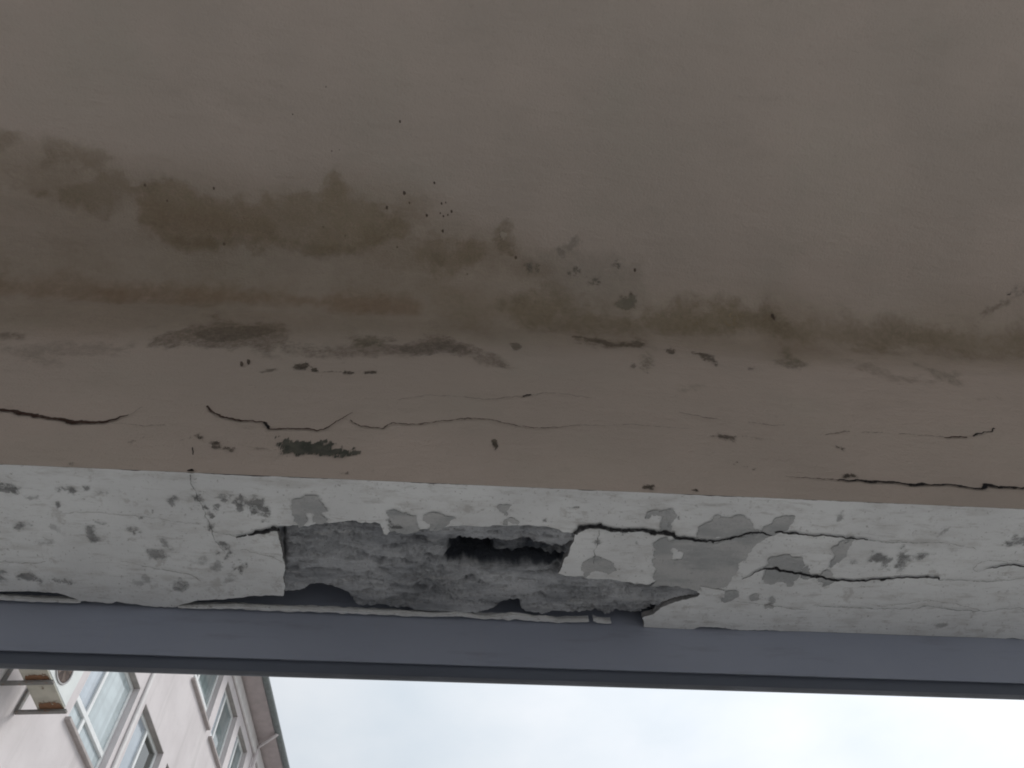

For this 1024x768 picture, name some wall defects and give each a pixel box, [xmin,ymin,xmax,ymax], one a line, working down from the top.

crack [0,409,142,426]
crack [206,392,594,431]
crack [796,477,1024,490]
spalling [279,495,855,614]
crack [573,523,1024,612]
peeling [869,546,928,568]